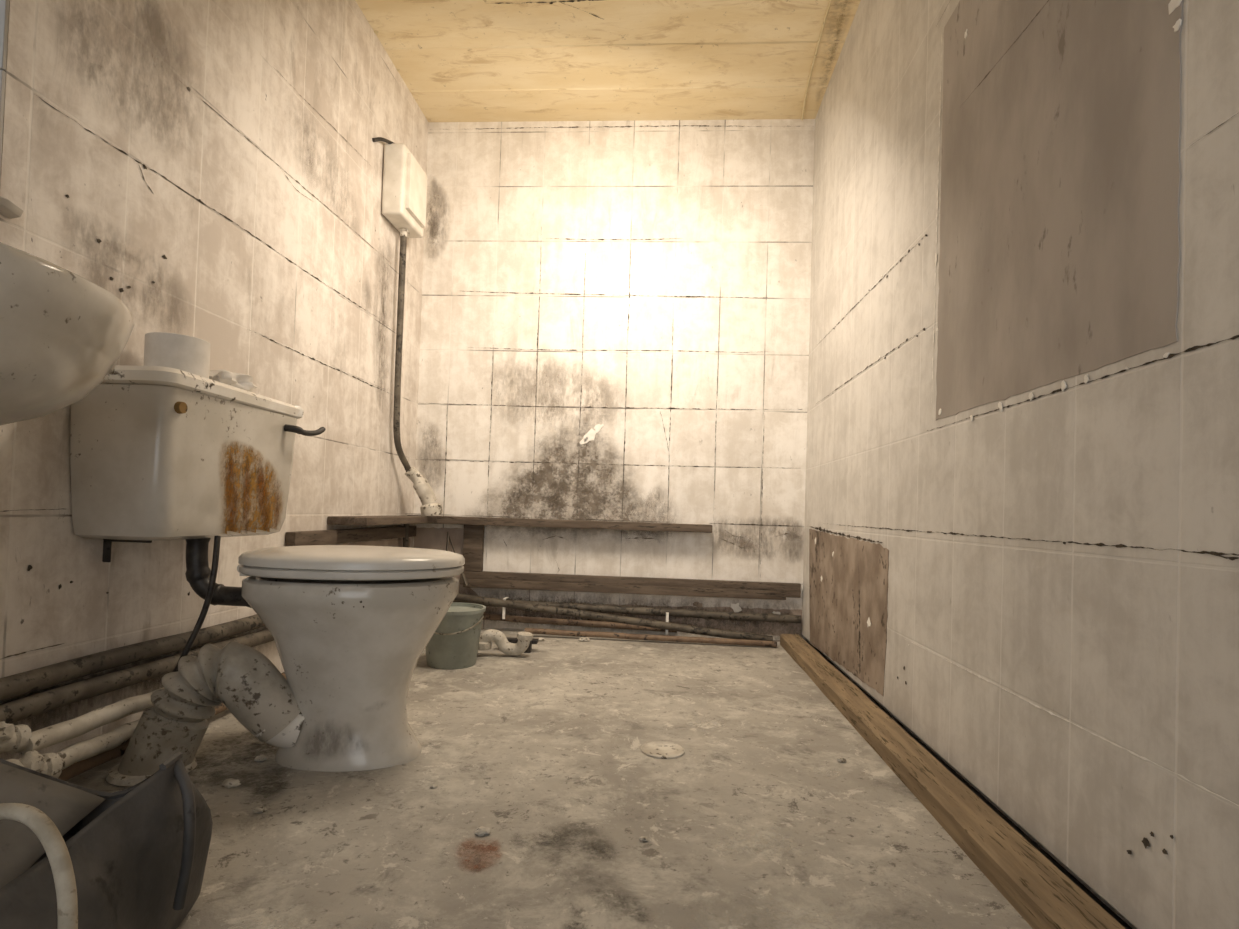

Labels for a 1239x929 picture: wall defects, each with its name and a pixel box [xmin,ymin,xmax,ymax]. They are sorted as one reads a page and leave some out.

flaking render [931,0,1183,421]
crack [927,335,1239,431]
flaking render [335,527,464,555]
peeling [453,526,907,696]
crack [837,524,1239,560]
crack [905,639,1239,806]